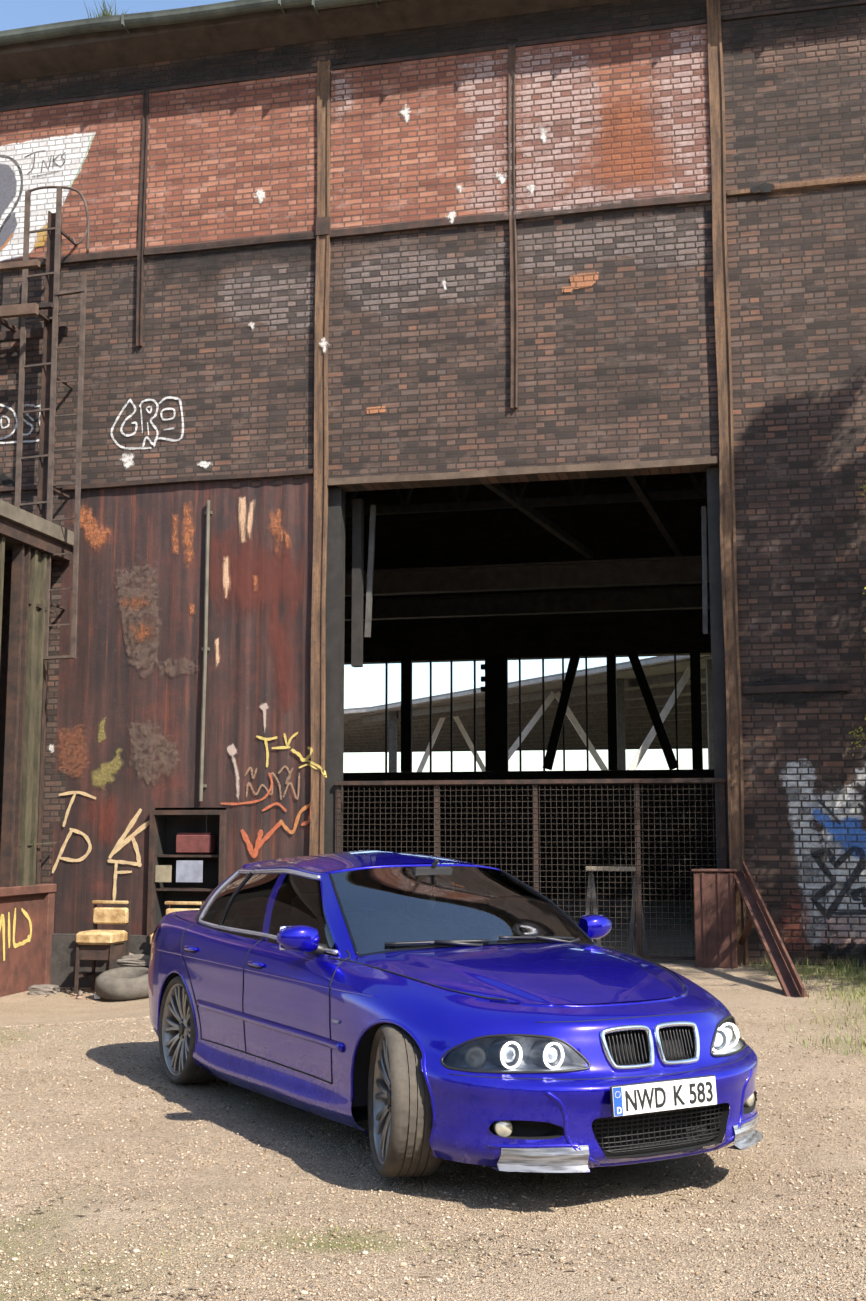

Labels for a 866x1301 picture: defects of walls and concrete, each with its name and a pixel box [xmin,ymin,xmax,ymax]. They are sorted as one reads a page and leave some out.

spalling [562,272,599,292]
rust [80,506,109,549]
rust [172,507,194,561]
rust [239,498,253,542]
rust [270,509,290,553]
peeling [116,564,197,678]
peeling [92,720,181,786]